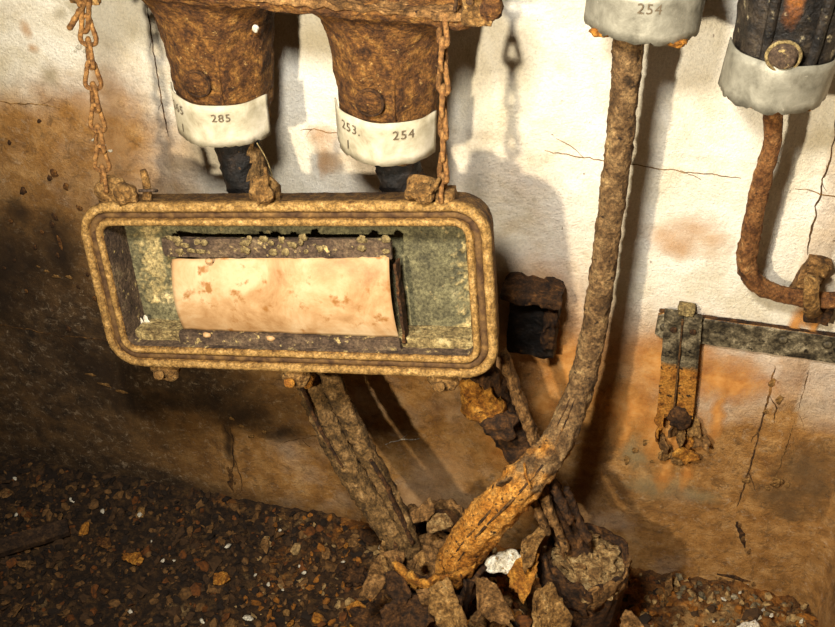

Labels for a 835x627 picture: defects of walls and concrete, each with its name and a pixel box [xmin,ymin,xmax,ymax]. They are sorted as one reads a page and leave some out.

crack [798,122,835,255]
crack [223,424,242,493]
rust [601,348,679,483]
rust [697,367,763,437]
crack [737,368,808,506]